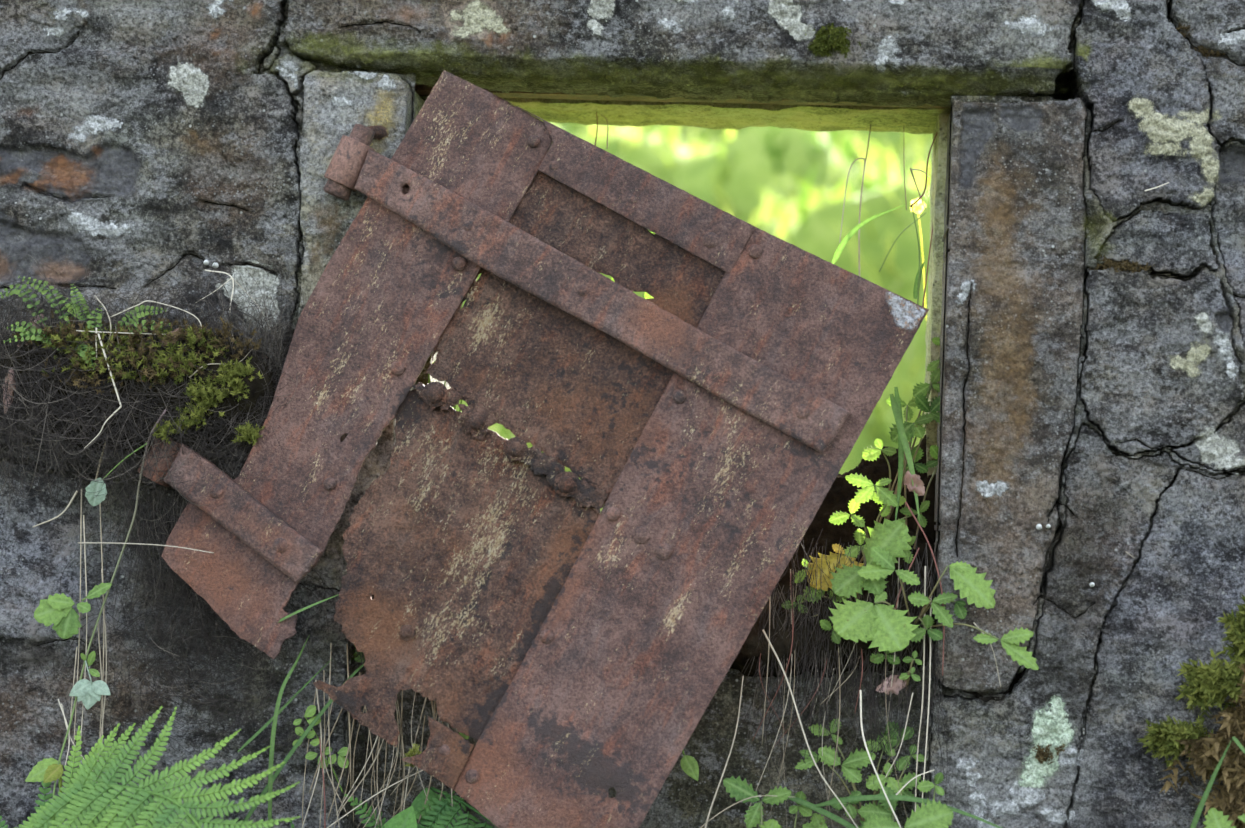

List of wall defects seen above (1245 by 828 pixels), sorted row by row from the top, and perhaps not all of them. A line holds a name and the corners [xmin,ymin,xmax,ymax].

crack [0,32,79,80]
crack [1166,0,1245,66]
rust [368,93,392,127]
crack [0,253,275,289]
crack [1149,269,1201,281]
crack [955,287,971,557]
crack [1119,439,1245,479]
crack [1033,447,1095,619]